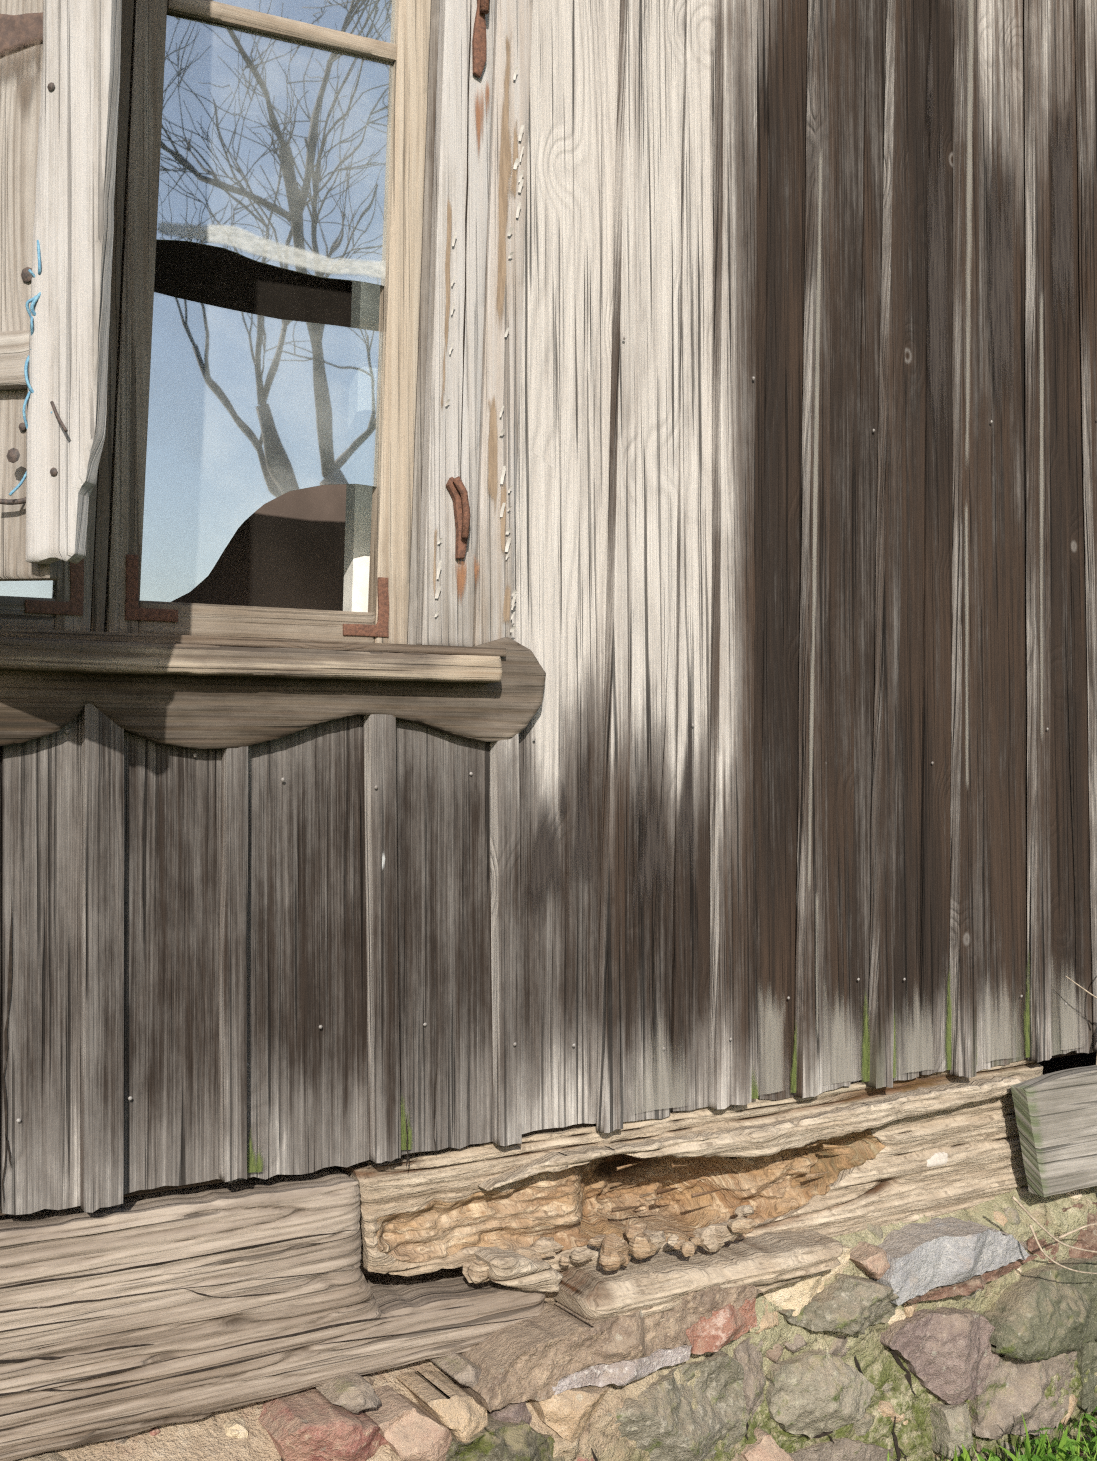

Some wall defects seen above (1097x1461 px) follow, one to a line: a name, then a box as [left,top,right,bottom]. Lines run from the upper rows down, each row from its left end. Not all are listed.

leakage [810,158,821,795]
leakage [531,760,591,915]
leakage [633,719,694,905]
leakage [644,1037,681,1111]
leakage [751,1008,797,1099]
leakage [817,1000,870,1084]
leakage [893,981,952,1078]
leakage [986,967,1030,1061]
crack [0,1229,535,1431]